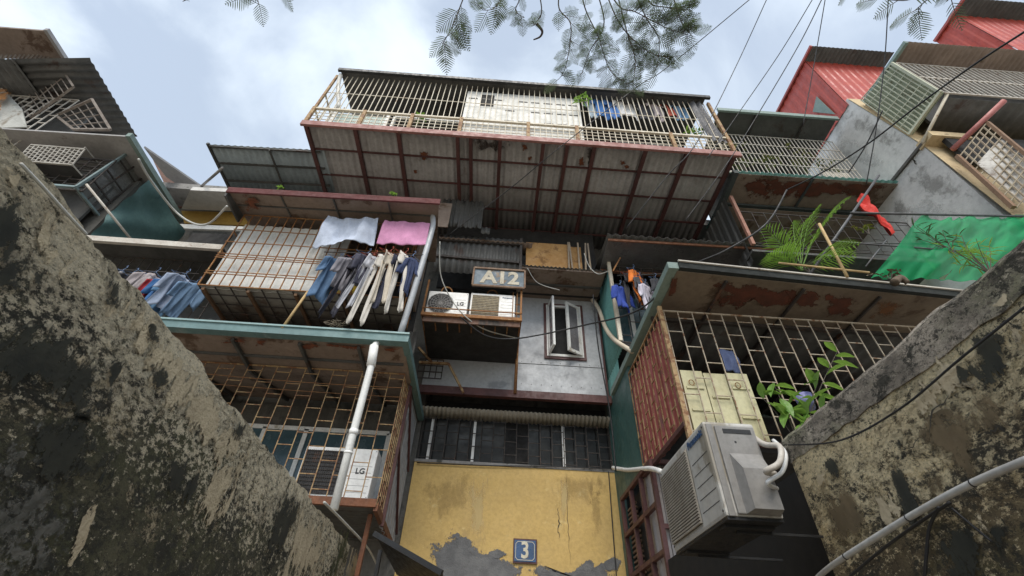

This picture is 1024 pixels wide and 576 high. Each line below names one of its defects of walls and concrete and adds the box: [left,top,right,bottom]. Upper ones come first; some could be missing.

rust [743,178,893,199]
rust [713,282,856,317]
leakage [150,364,169,390]
leakage [0,320,123,491]
leakage [890,319,1024,525]
leakage [162,454,200,504]
leakage [826,486,865,548]
spalling [430,533,621,576]